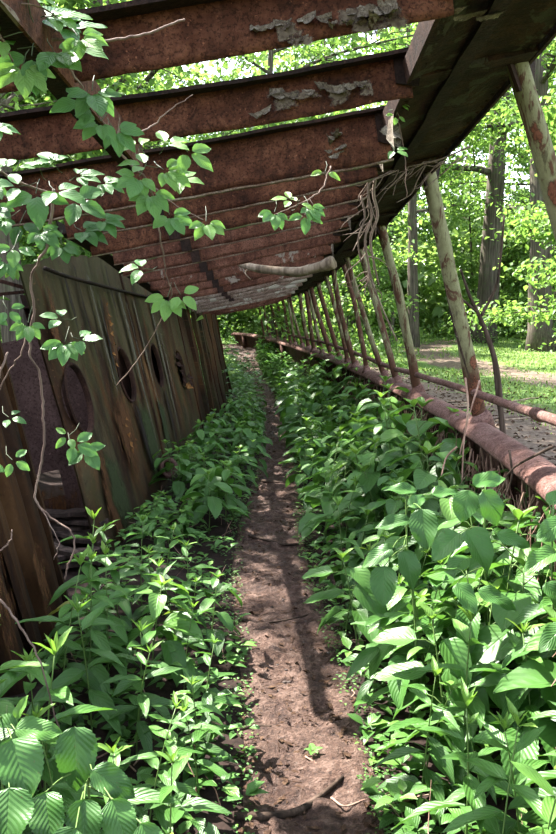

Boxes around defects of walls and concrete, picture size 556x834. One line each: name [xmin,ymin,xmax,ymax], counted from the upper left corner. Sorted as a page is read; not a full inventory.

peeling [249,0,409,48]
peeling [249,80,374,119]
peeling [324,127,347,159]
rust [530,121,543,143]
rust [547,179,556,206]
rust [114,388,141,480]